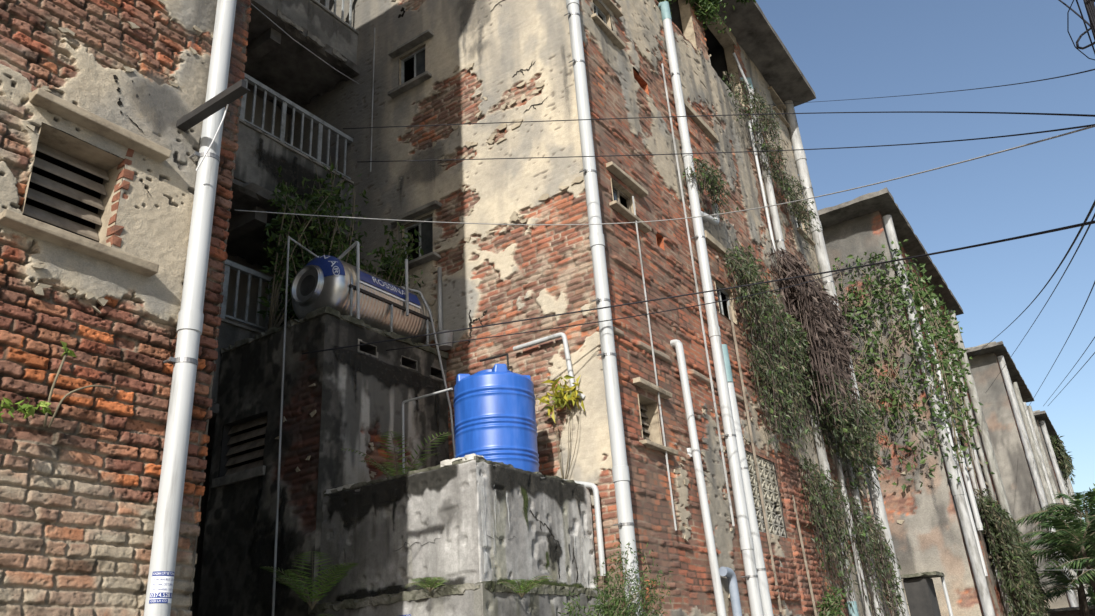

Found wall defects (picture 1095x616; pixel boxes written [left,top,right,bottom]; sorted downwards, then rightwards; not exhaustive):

flaking render [0,0,213,211]
flaking render [227,0,251,88]
flaking render [397,63,544,171]
flaking render [0,232,178,506]
flaking render [182,96,243,515]
flaking render [428,176,602,476]
water stain [250,475,303,615]
water stain [328,464,457,530]
water stain [481,462,586,573]
crack [529,510,578,582]
flaking render [591,453,627,615]